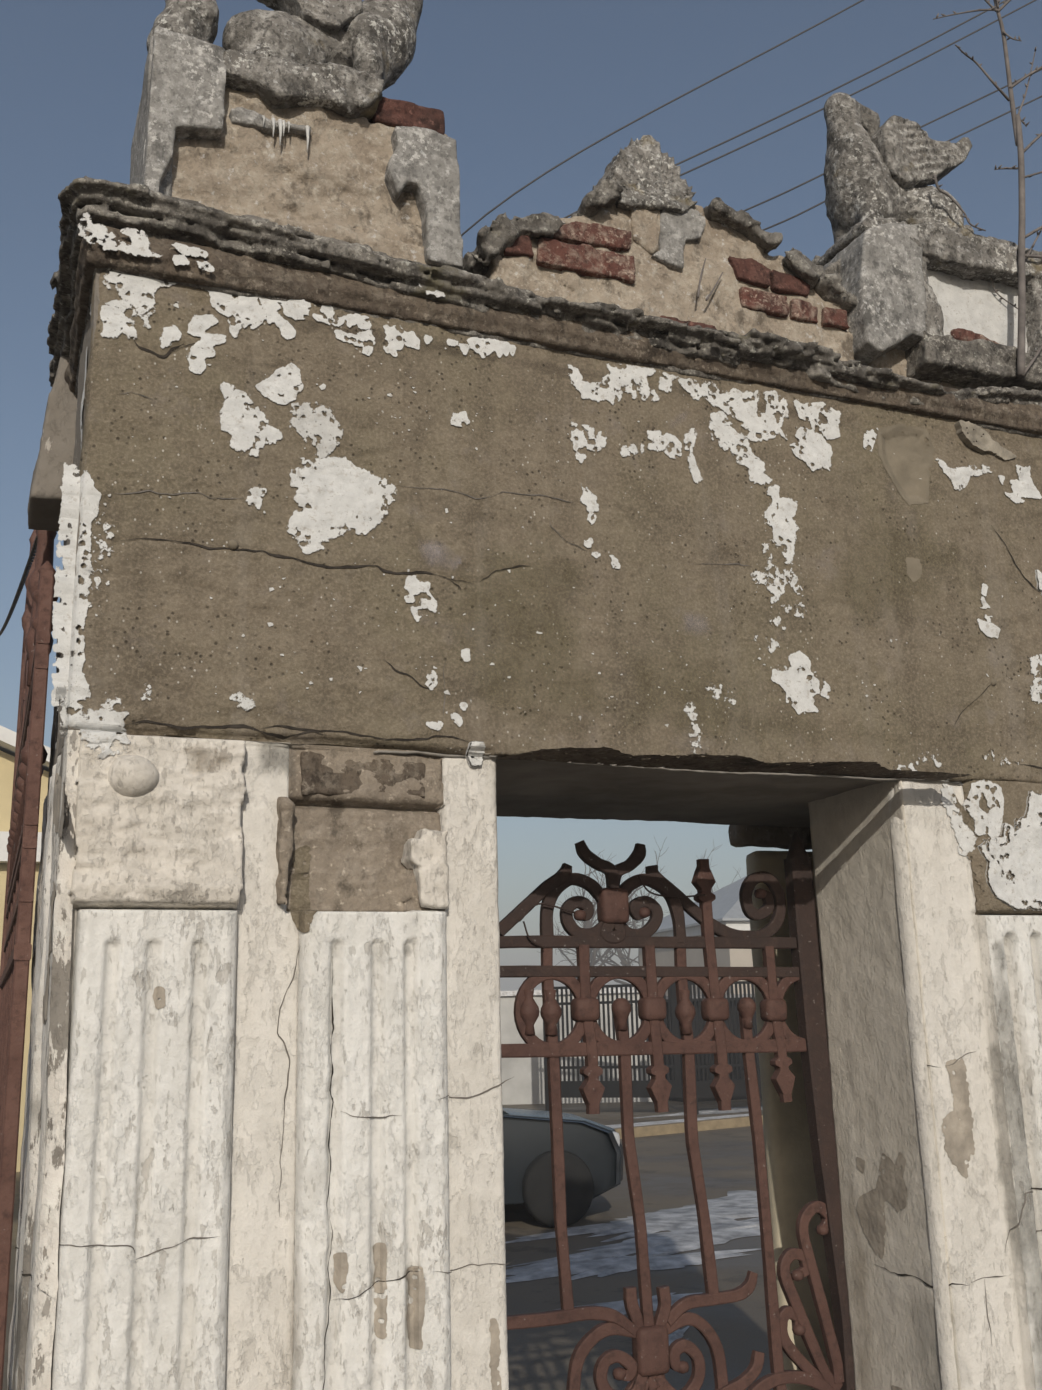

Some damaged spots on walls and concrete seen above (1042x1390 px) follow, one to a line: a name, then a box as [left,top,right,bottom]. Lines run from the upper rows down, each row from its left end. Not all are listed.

peeling [78,212,215,272]
peeling [89,271,516,374]
peeling [51,462,131,759]
peeling [220,363,396,554]
crack [114,538,527,591]
peeling [568,364,841,715]
peeling [465,702,1042,912]
crack [15,1185,40,1288]
crack [59,1237,212,1259]
crack [277,946,300,1214]
crack [323,958,513,1389]
crack [874,1188,1042,1343]